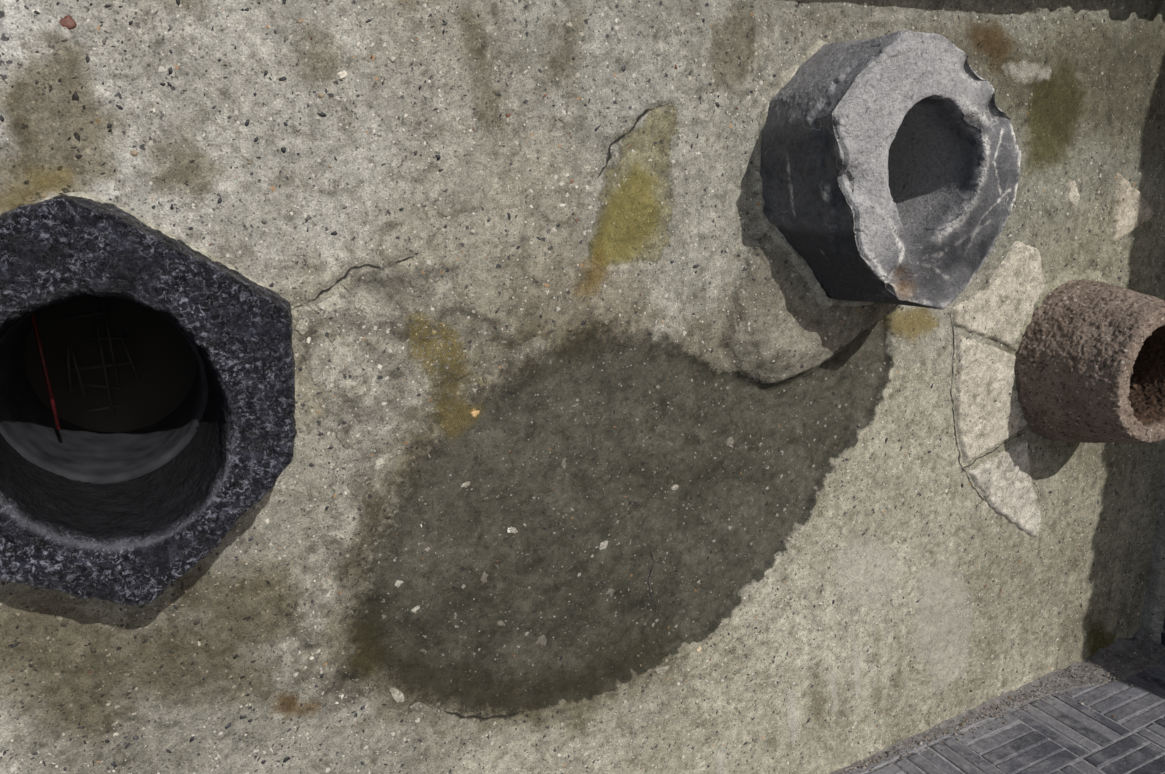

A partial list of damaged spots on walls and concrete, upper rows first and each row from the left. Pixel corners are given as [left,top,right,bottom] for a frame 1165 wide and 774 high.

crack [292,256,414,319]
leakage [836,541,899,605]